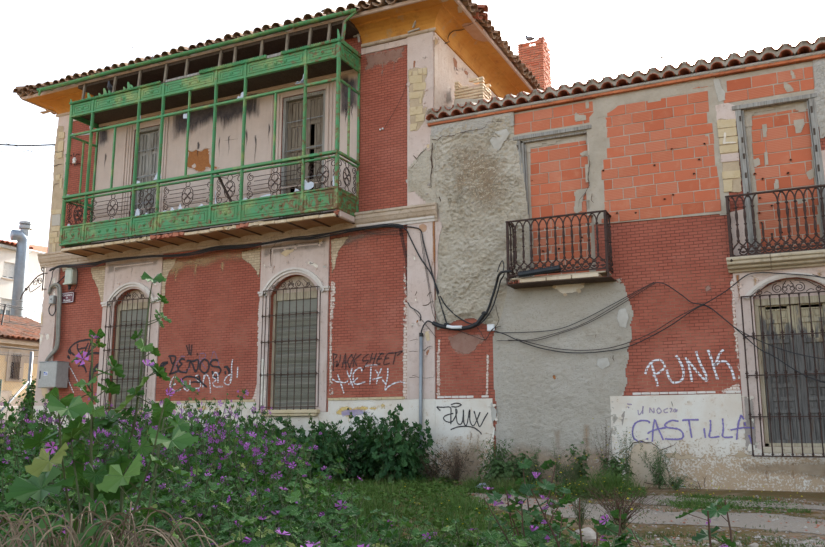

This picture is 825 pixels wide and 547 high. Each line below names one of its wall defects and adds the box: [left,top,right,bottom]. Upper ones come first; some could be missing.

damp [174,94,257,133]
peeling [402,266,484,399]
spalling [486,353,498,443]